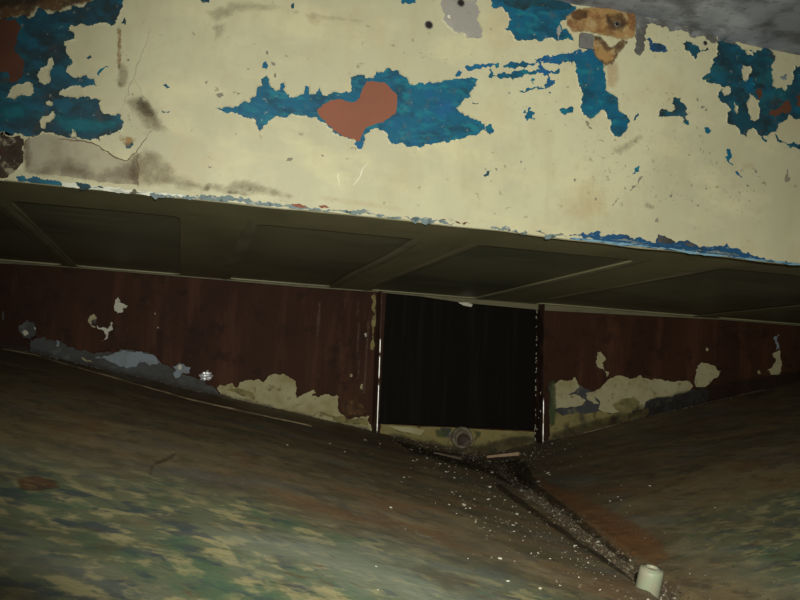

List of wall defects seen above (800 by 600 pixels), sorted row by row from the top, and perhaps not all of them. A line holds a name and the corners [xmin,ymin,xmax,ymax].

crack [60,131,151,184]
peeling [0,0,468,225]
peeling [214,0,639,151]
corrosion [567,7,636,65]
peeling [634,15,800,149]
peeling [490,226,800,265]
peeling [18,294,537,454]
peeling [548,349,720,439]
peeling [757,335,782,376]